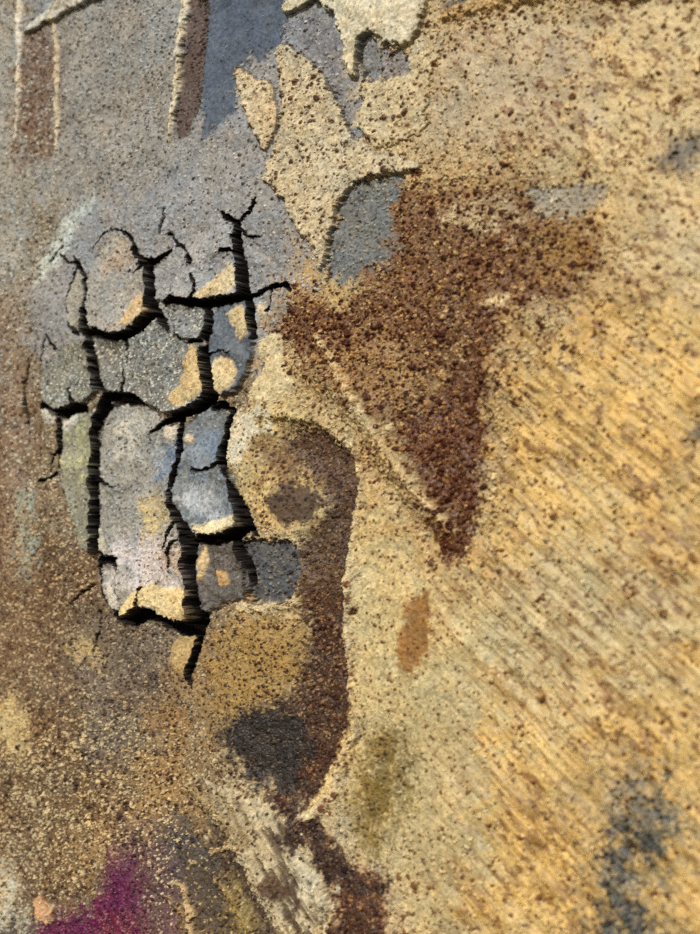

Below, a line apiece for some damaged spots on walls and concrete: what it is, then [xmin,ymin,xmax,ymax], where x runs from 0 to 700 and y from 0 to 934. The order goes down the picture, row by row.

crack [25,199,290,675]
flaking render [175,0,446,294]
corrosion [262,171,610,934]
flaking render [520,179,608,224]